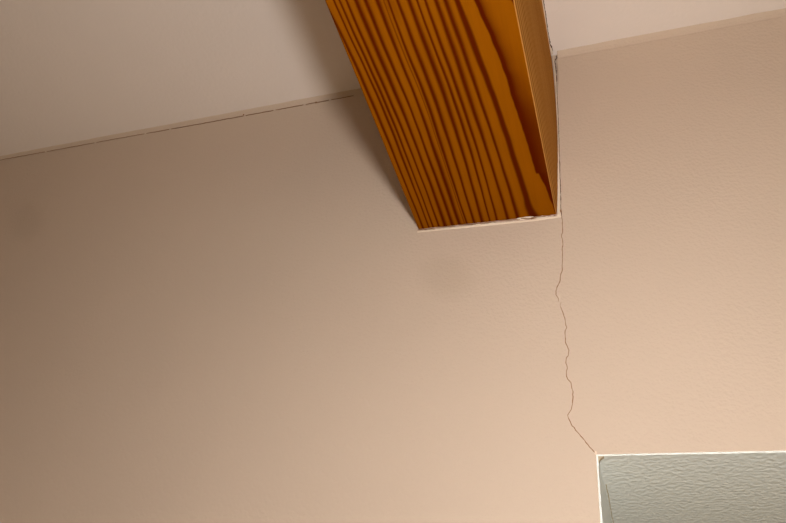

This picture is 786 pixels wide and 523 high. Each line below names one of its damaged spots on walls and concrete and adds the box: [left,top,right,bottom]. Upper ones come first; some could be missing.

crack [542,0,595,453]